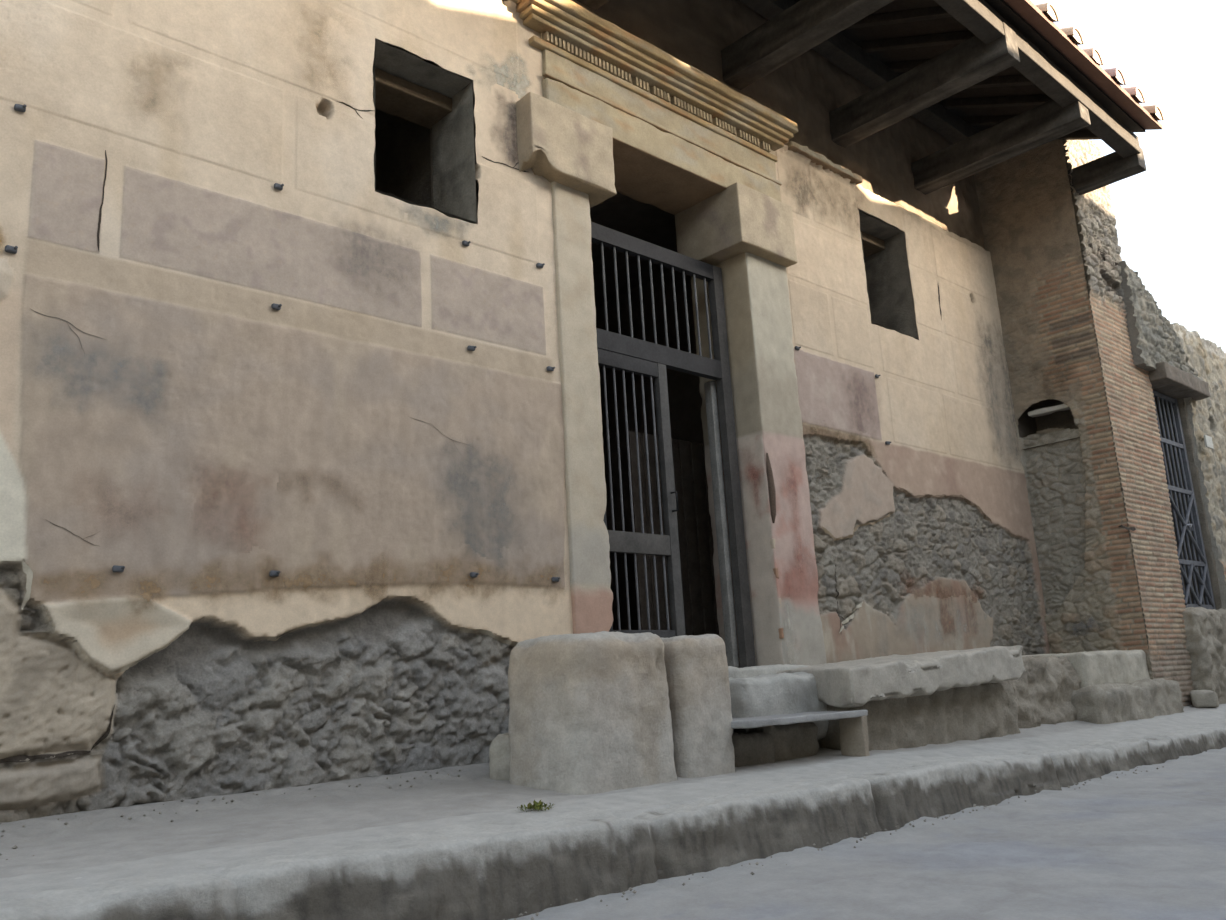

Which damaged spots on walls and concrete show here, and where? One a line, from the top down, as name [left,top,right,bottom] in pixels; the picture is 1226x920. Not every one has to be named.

crack [31,309,107,355]
spalling [0,558,78,643]
spalling [0,596,518,823]
spalling [803,433,1047,655]